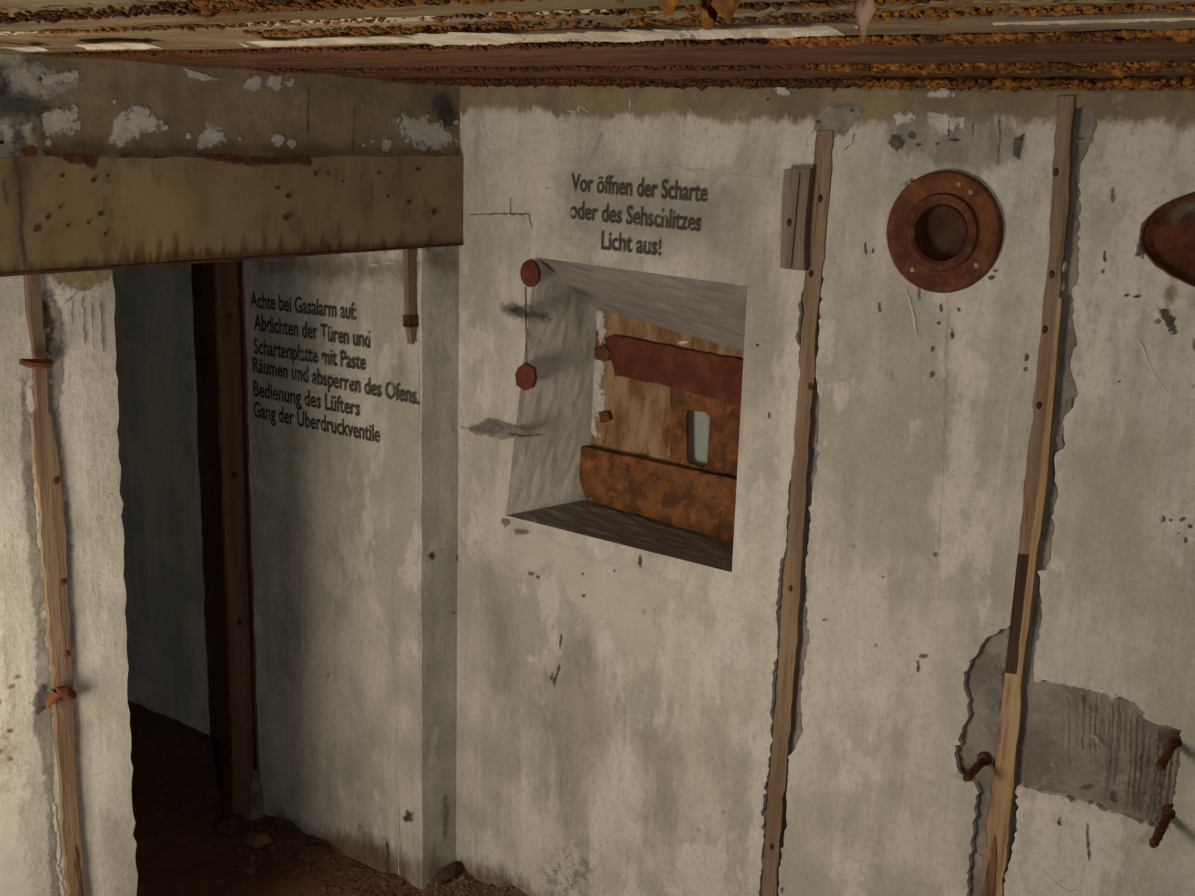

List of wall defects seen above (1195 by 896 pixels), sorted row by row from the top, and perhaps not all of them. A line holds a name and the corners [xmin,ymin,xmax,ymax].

rust [0,0,1195,92]
peeling [107,100,168,148]
peeling [362,114,459,152]
peeling [887,88,1024,173]
spalling [1004,105,1182,882]
spalling [955,626,1010,896]